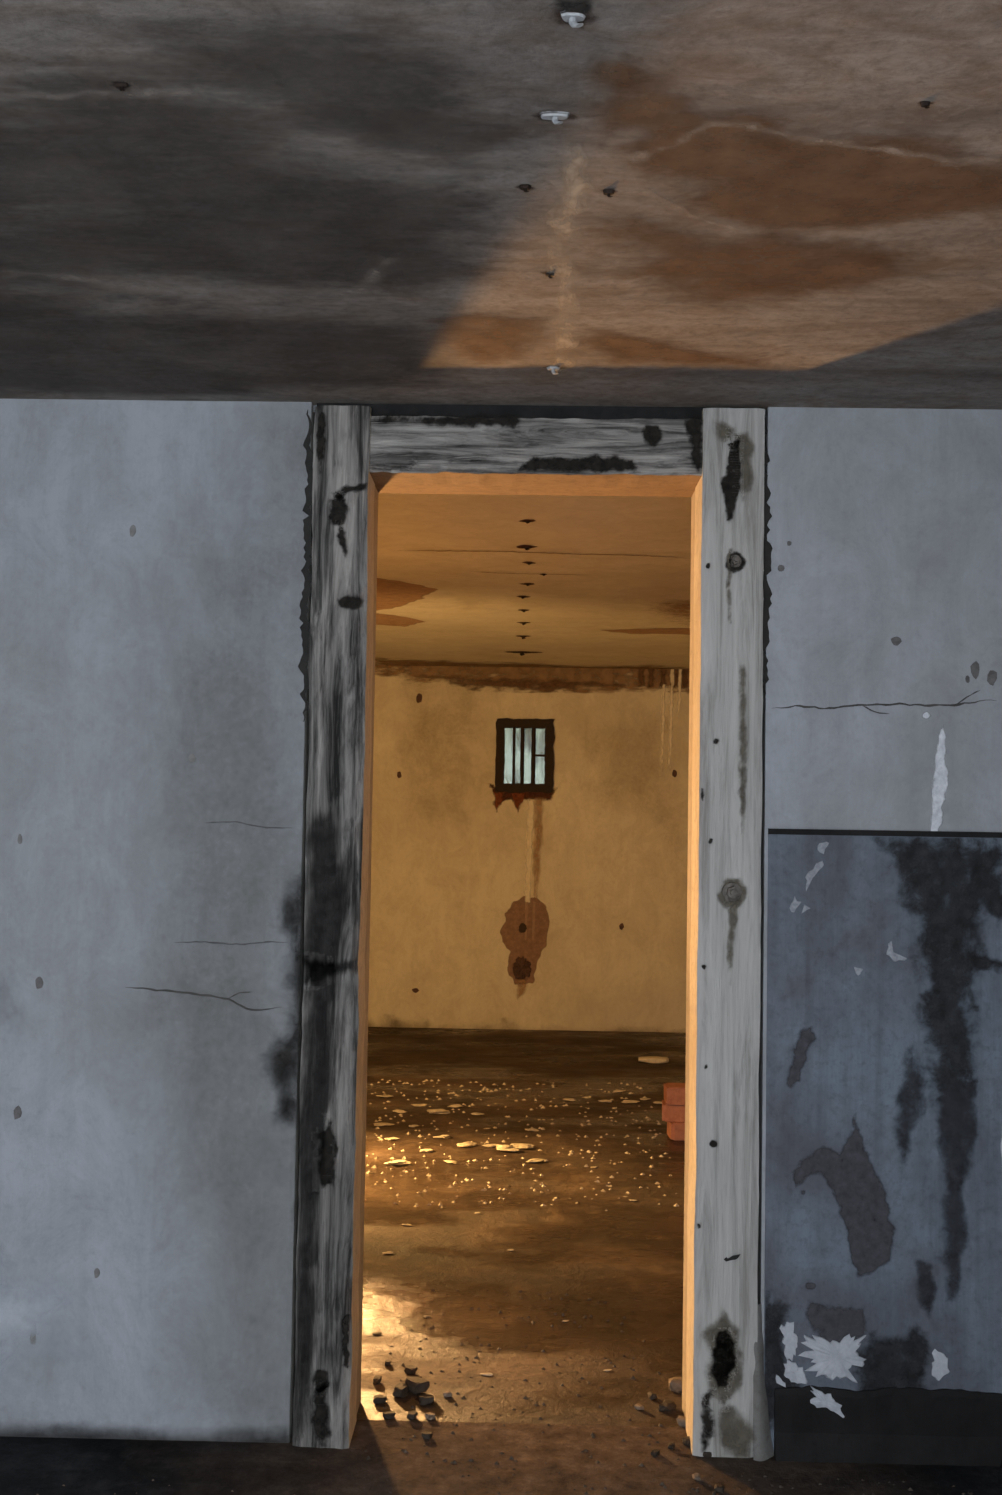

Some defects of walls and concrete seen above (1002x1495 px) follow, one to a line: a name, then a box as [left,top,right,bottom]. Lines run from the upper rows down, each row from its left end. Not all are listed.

crack [763,410,996,714]
rust [490,784,555,879]
crack [174,939,288,947]
crack [126,987,279,1011]
damp [878,712,1002,1311]
peeling [793,1118,895,1276]
spalling [776,1283,866,1418]
damp [856,1328,929,1391]
spalling [932,1349,950,1381]